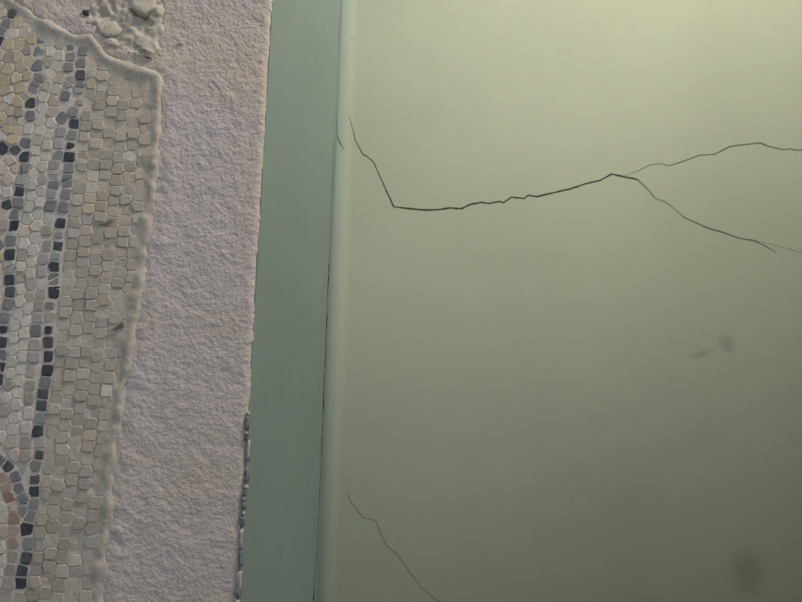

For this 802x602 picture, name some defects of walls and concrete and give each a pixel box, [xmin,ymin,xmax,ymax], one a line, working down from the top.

crack [332,111,800,253]